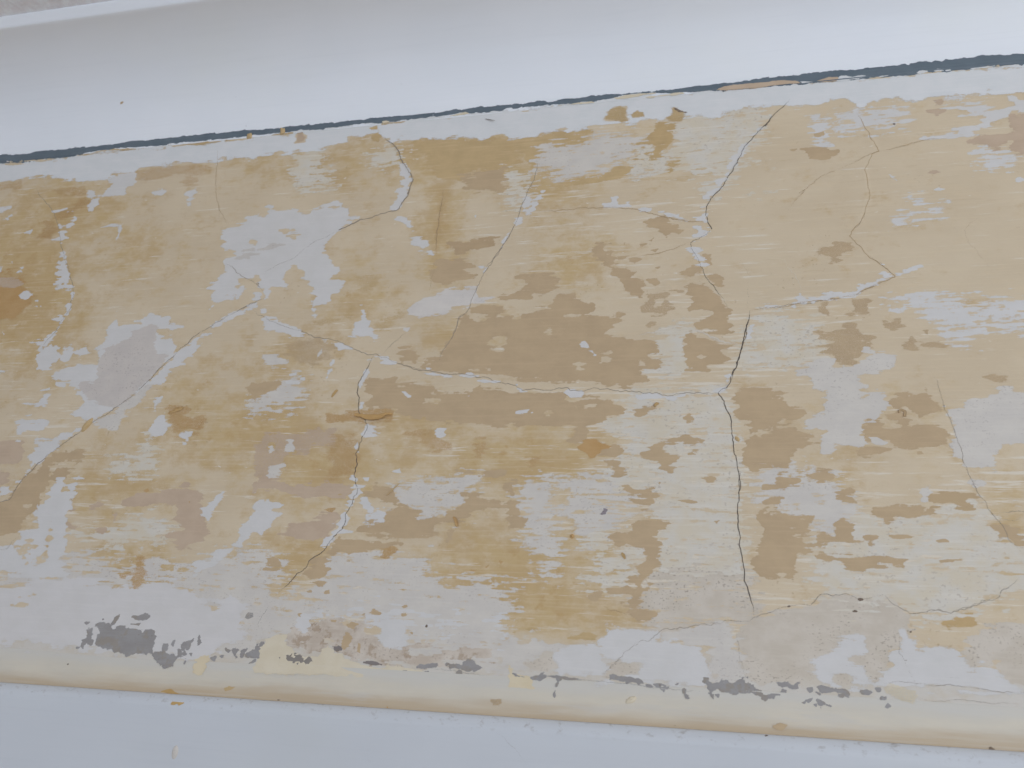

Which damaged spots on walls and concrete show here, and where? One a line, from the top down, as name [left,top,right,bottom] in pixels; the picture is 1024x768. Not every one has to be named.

flaking render [86,171,137,211]
flaking render [0,313,265,669]
peeling [245,354,305,400]
flaking render [266,439,295,478]
flaking render [206,200,360,318]
peeling [192,469,528,594]
flaking render [348,304,380,342]
peeling [0,54,1024,194]
crack [1,105,1024,671]
peeling [354,215,735,444]
flaking render [279,413,1024,709]
flaking render [731,298,1024,580]